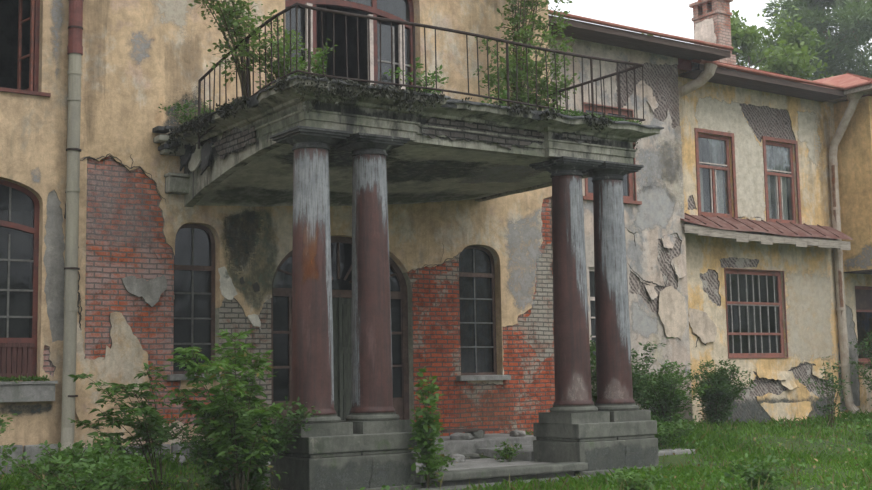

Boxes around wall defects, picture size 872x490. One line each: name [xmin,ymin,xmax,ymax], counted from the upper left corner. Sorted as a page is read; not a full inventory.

flaking render [615,61,680,128]
flaking render [84,156,272,427]
damp [212,187,293,268]
peeling [293,149,334,403]
damp [329,191,352,205]
peeling [352,154,390,406]
damp [387,193,484,204]
flaking render [407,197,555,436]
peeling [598,181,681,360]
crack [625,227,677,296]
peeling [695,96,822,221]
flaking render [731,305,860,424]